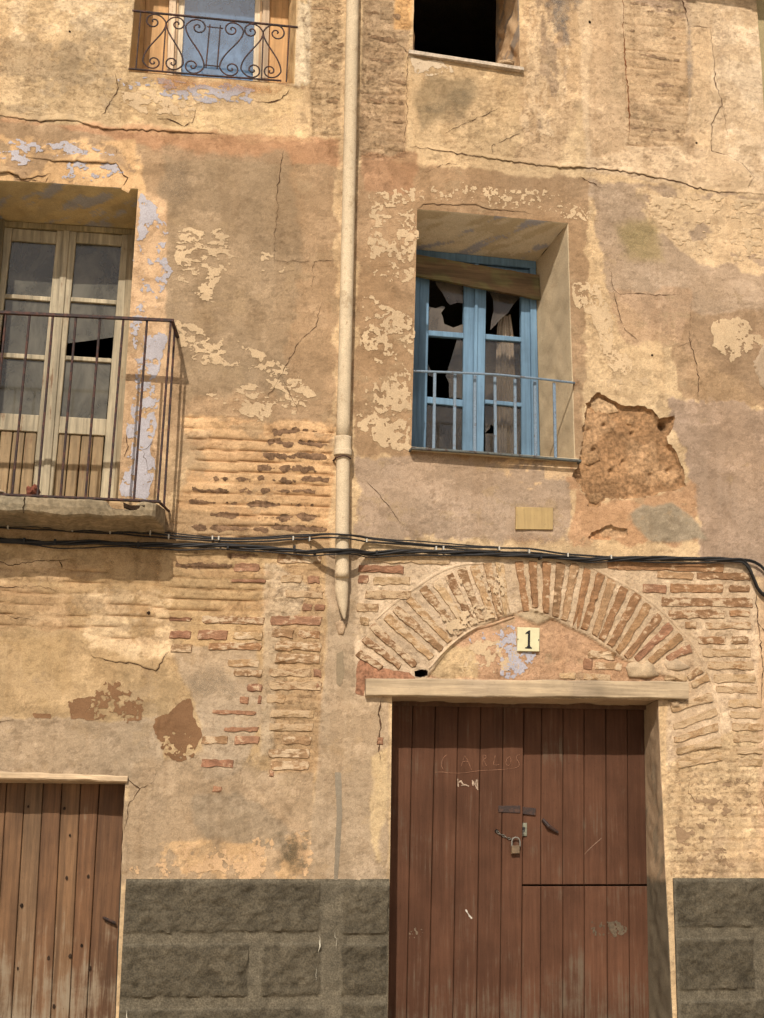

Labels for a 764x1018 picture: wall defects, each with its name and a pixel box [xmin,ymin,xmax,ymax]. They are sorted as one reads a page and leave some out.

crack [0,75,220,193]
crack [398,0,764,195]
crack [415,199,531,214]
peeling [365,182,598,282]
peeling [119,193,316,510]
peeling [356,295,415,451]
crack [609,268,700,392]
peeling [711,317,764,389]
spalling [189,427,329,533]
flaking render [572,392,686,507]
crack [92,650,168,671]
flaking render [153,552,325,777]